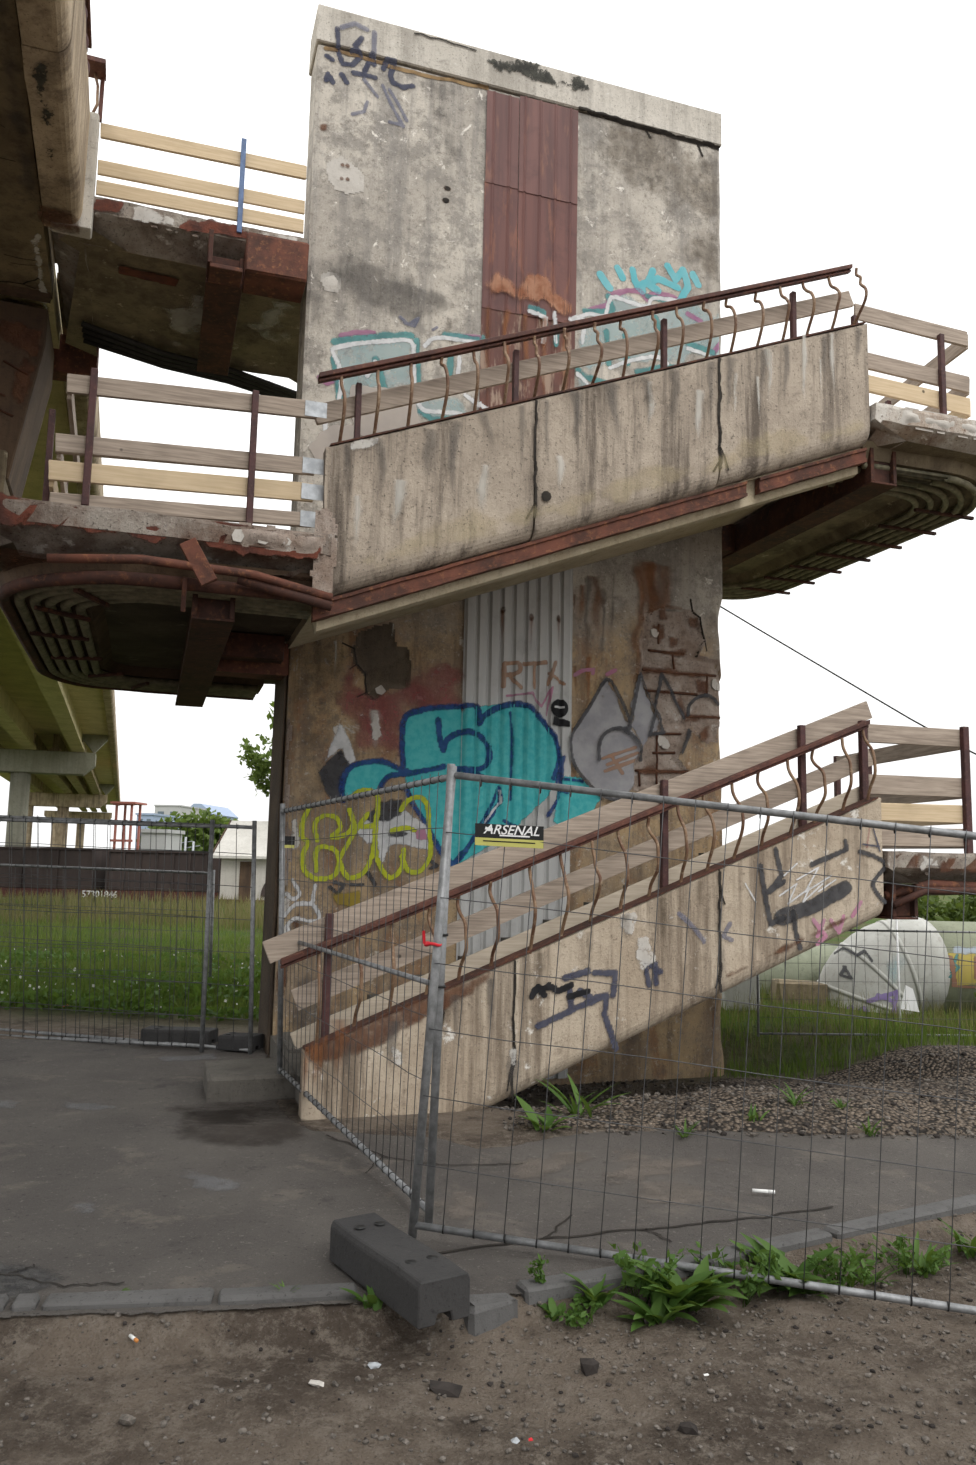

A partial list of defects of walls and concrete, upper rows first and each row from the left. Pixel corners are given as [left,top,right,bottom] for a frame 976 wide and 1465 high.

damp [487,59,589,91]
crack [578,106,720,157]
peeling [133,206,209,241]
rust [487,273,572,358]
damp [803,334,833,378]
crack [713,358,729,472]
crack [526,400,538,519]
spalling [351,622,411,740]
rust [308,975,489,1060]